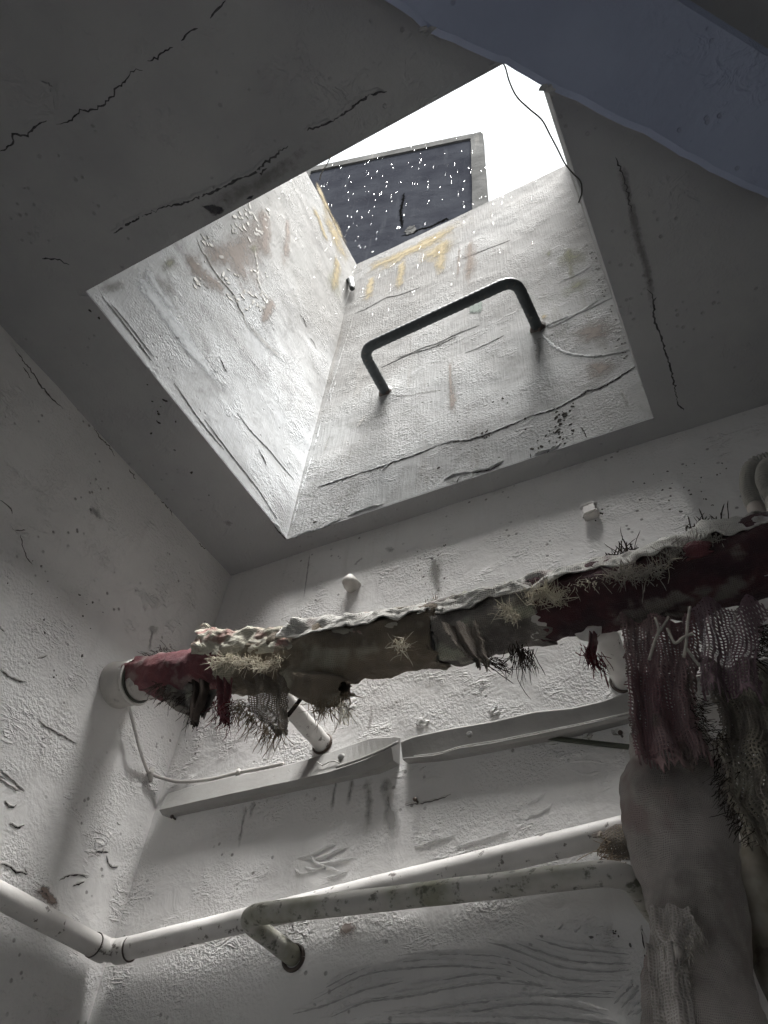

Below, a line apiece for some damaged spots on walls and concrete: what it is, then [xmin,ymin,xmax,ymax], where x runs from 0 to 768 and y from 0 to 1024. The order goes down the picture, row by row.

crack [1,0,226,151]
damp [203,205,223,215]
crack [110,87,387,233]
corrosion [366,228,449,298]
crack [615,157,632,212]
crack [107,303,154,361]
crack [648,290,684,410]
crack [174,312,635,539]